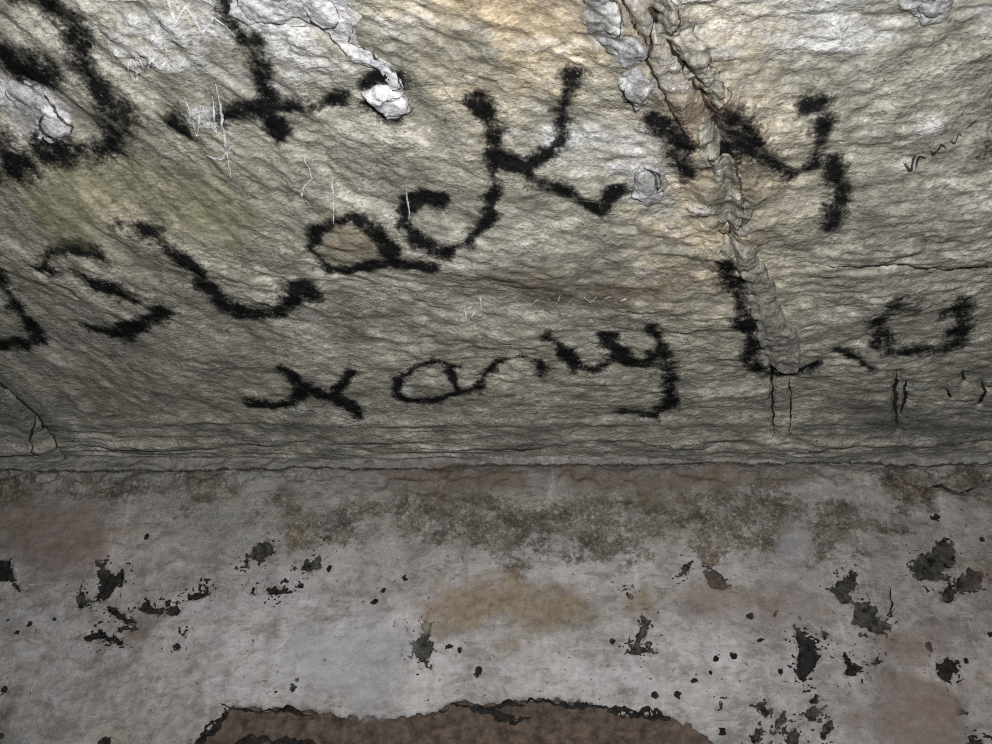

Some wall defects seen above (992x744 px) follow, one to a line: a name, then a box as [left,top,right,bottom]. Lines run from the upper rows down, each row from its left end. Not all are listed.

damp [0,76,75,143]
damp [229,0,413,120]
damp [580,0,655,112]
damp [639,0,753,238]
damp [897,0,954,27]
crack [0,364,992,503]
peeling [66,554,217,655]
peeling [401,608,462,675]
peeling [609,603,662,668]
peeling [741,564,899,744]
peeling [902,533,992,603]
spalling [194,691,726,744]